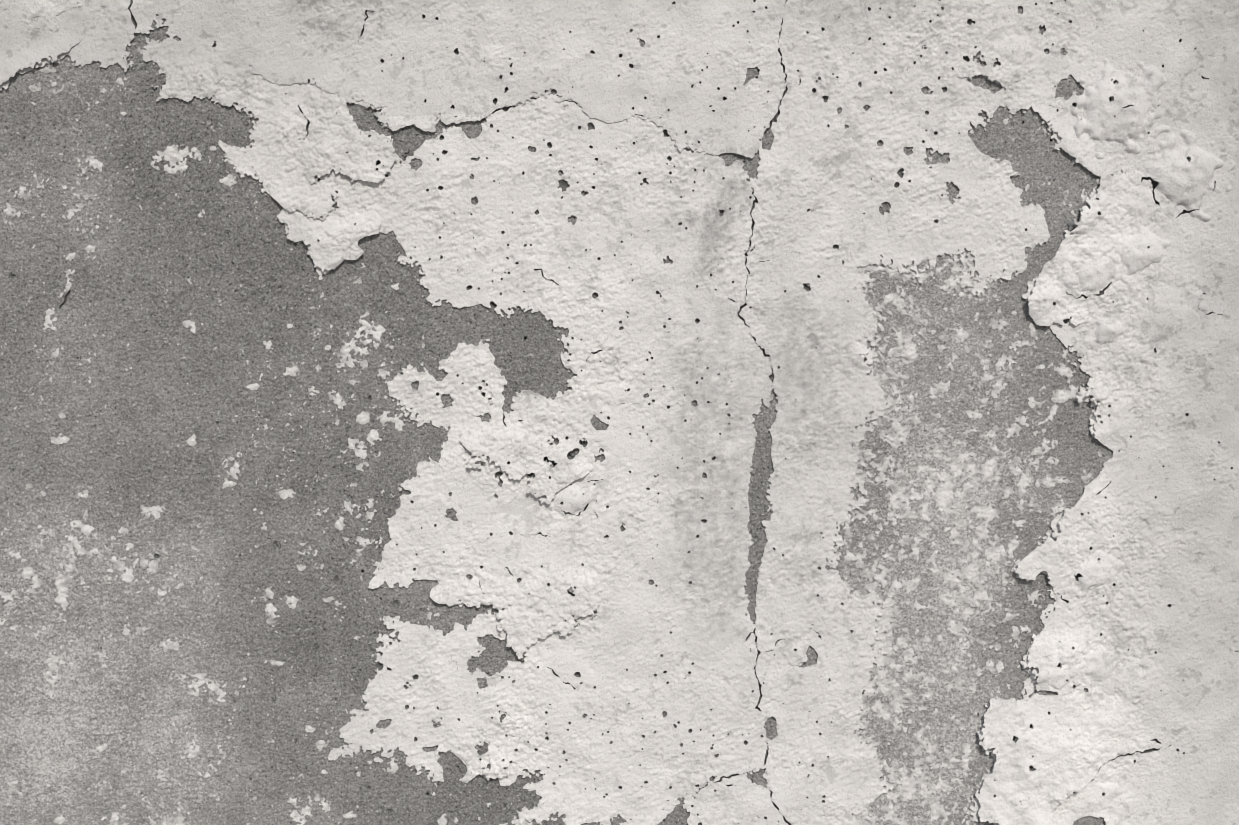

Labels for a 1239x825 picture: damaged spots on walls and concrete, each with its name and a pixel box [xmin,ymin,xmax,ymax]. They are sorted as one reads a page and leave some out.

crack [128,0,137,29]
crack [298,105,310,140]
crack [728,187,774,382]
peeling [0,14,577,825]
peeling [591,415,609,430]
peeling [820,51,1113,825]
crack [537,479,603,537]
crack [746,628,818,711]
peeling [581,814,632,825]
peeling [658,792,698,825]
crack [699,743,791,825]
crack [1055,739,1171,810]